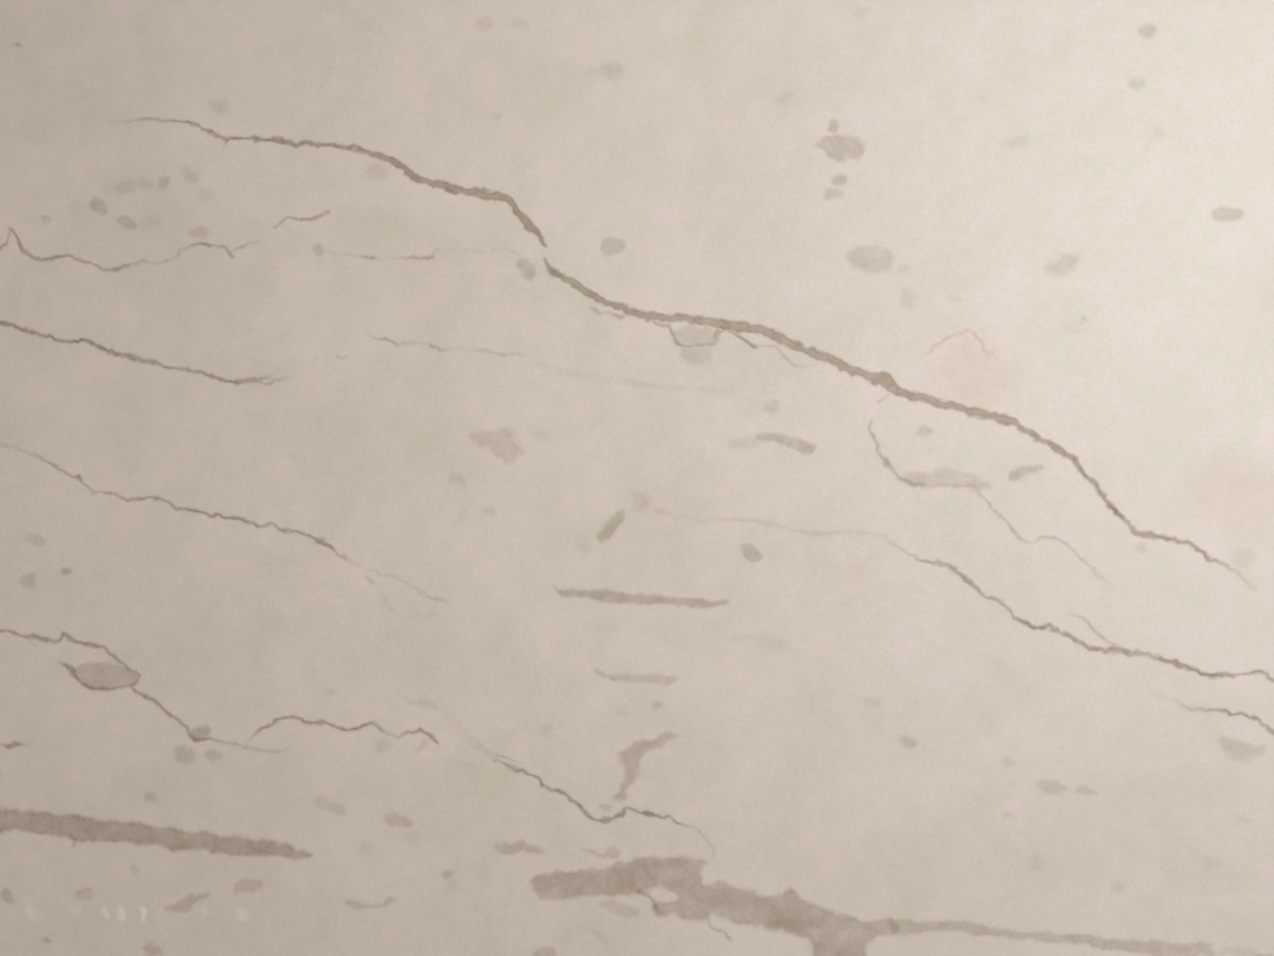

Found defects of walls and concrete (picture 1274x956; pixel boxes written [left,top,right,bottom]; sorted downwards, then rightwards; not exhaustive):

crack [0,115,1259,592]
crack [0,440,451,620]
damp [551,584,730,611]
crack [626,510,1274,738]
damp [0,803,316,877]
crack [0,627,717,864]
damp [598,729,680,814]
damp [492,836,1274,956]